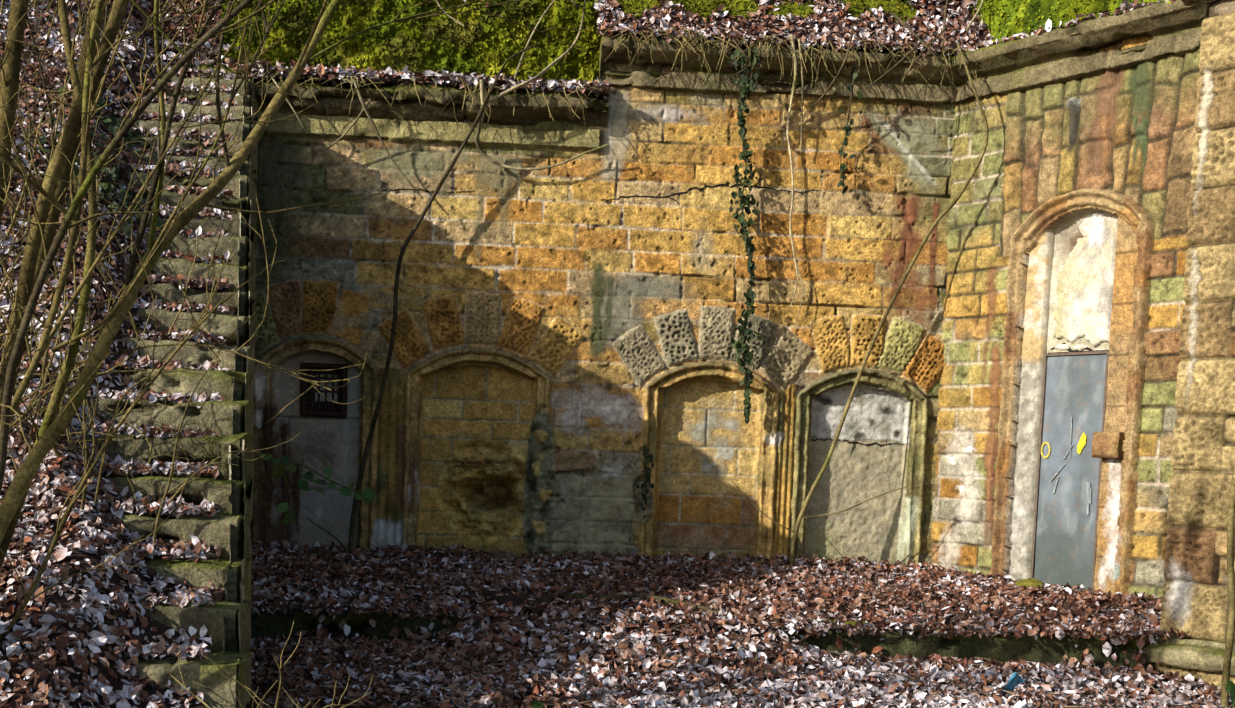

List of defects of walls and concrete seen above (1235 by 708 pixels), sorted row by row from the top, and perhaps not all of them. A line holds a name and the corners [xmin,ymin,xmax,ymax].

corrosion [881,197,940,335]
peeling [1053,216,1117,351]
peeling [522,407,654,558]
crack [809,437,910,455]